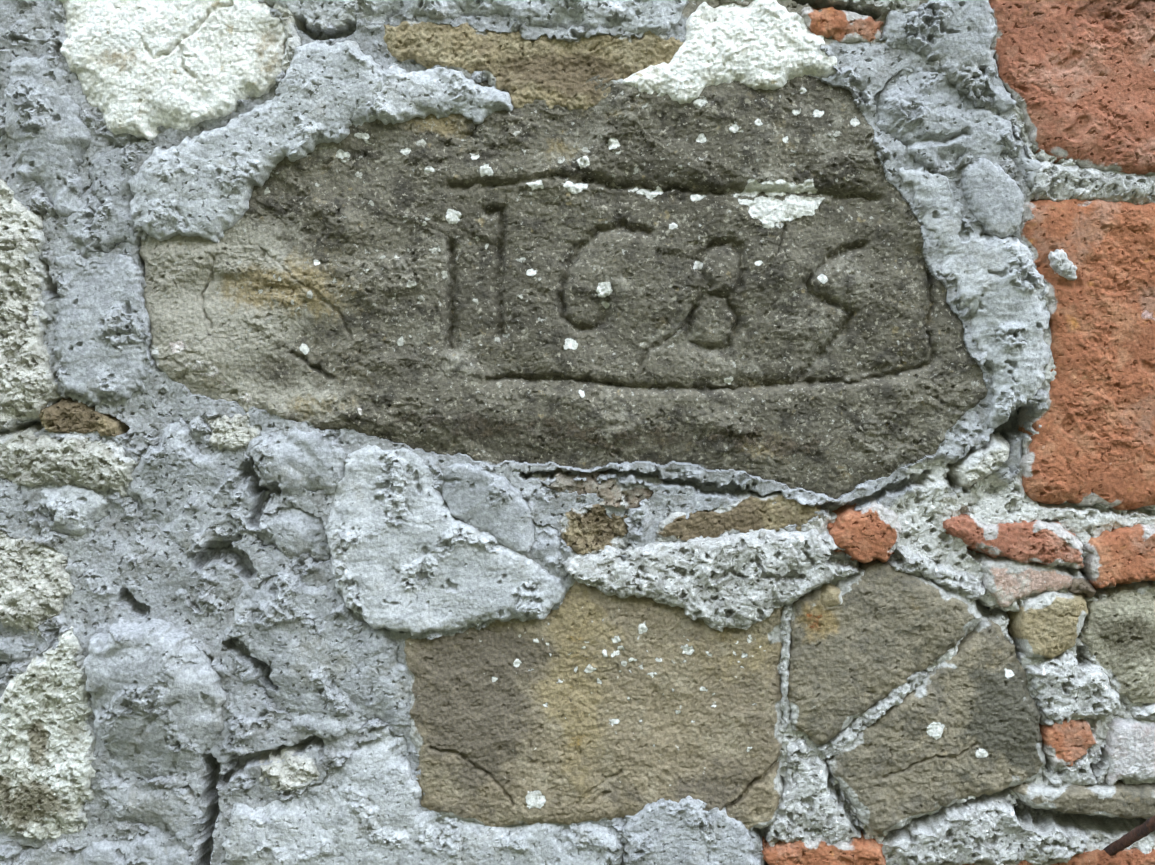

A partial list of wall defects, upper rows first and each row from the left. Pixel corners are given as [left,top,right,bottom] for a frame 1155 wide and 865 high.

crack [197,735,325,865]